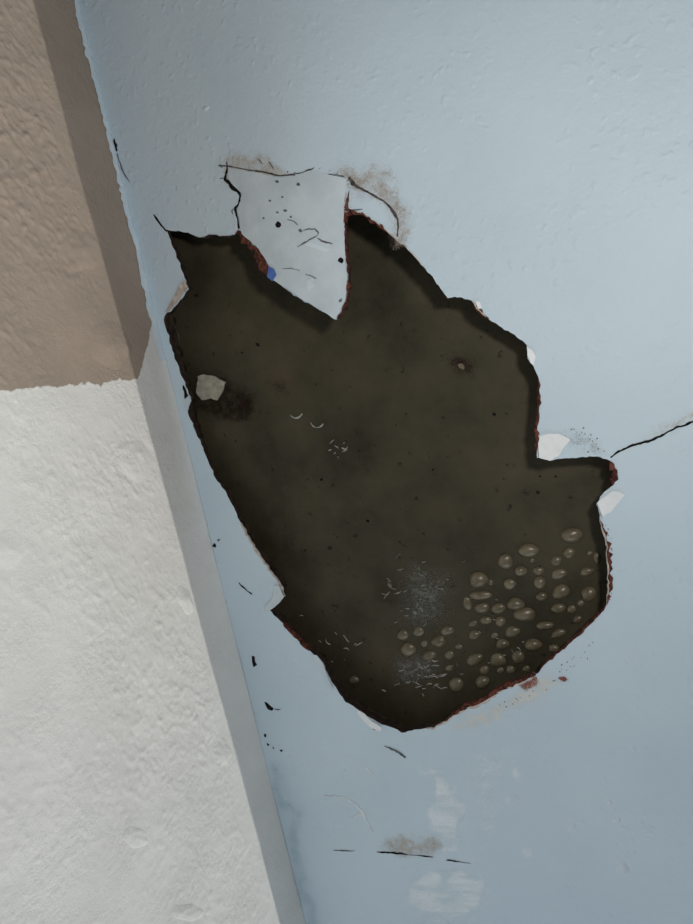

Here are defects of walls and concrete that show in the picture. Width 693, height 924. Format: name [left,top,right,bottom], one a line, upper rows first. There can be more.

crack [218,159,399,237]
spalling [164,168,625,733]
crack [611,421,693,458]
crack [378,852,471,864]